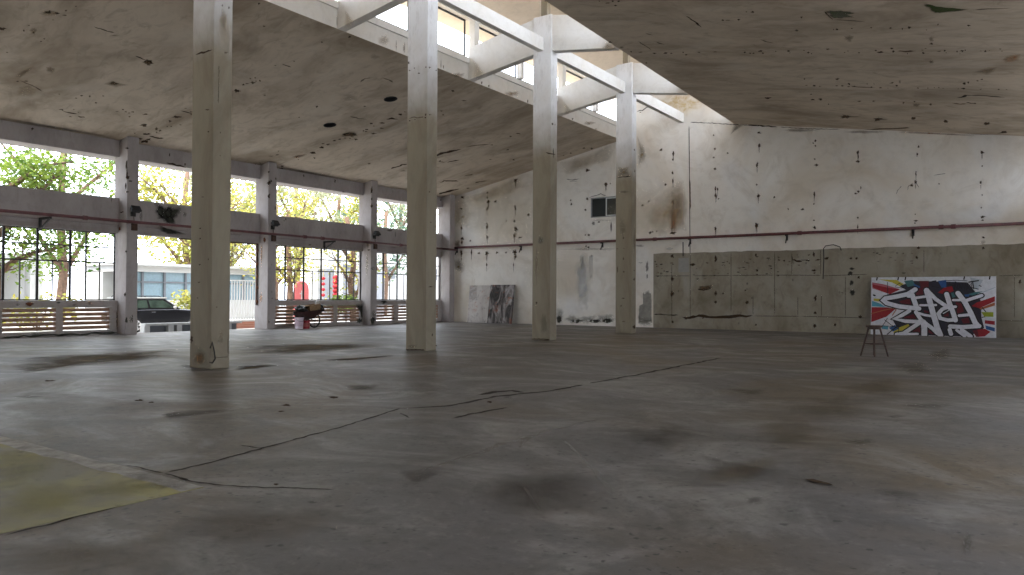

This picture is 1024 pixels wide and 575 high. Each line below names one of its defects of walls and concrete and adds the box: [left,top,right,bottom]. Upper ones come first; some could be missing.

water stain [557,313,612,323]
crack [481,390,520,403]
crack [126,465,332,490]